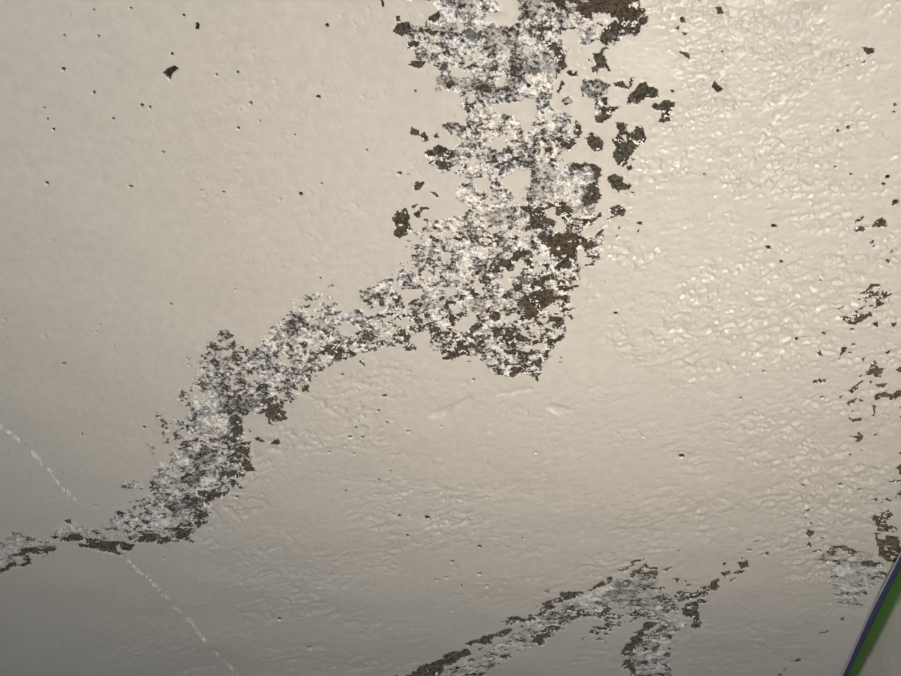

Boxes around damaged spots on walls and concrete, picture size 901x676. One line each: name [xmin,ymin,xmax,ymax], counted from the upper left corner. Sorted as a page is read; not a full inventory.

peeling [0,0,676,572]
peeling [837,284,892,327]
peeling [854,216,888,249]
peeling [838,357,901,422]
peeling [804,465,901,607]
peeling [395,540,759,676]